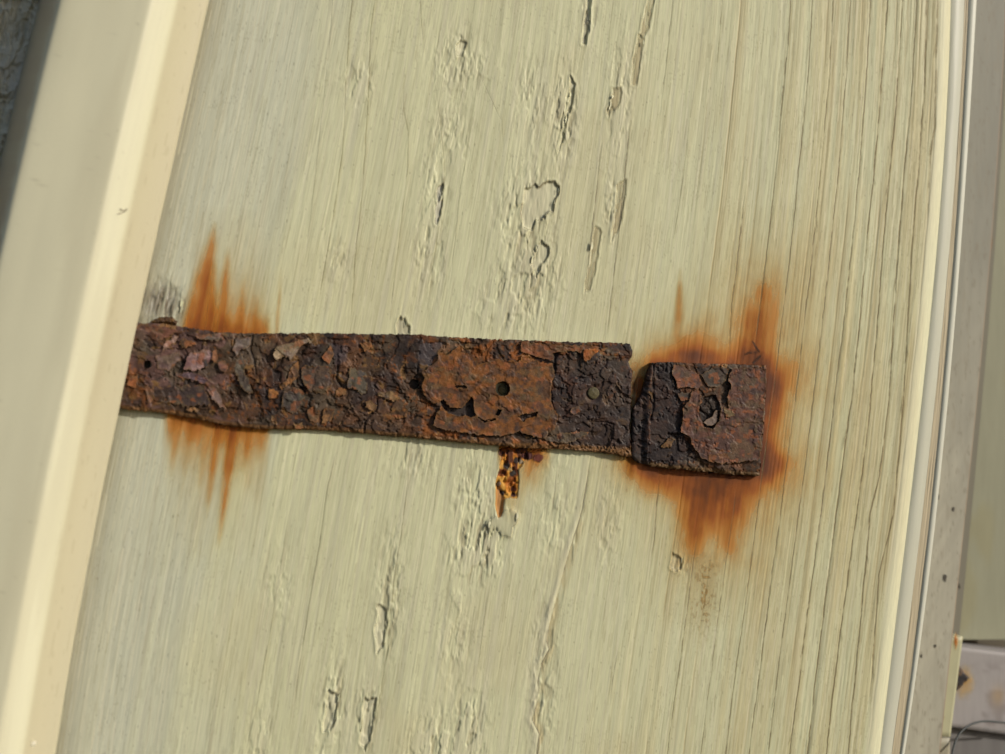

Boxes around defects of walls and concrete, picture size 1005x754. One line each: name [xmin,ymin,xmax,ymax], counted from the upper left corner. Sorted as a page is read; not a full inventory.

peeling [633,0,654,85]
peeling [520,180,560,230]
peeling [531,240,550,278]
corrosion [127,239,269,516]
corrosion [268,338,408,429]
corrosion [421,341,599,477]
corrosion [618,283,799,557]
peeling [322,690,340,732]
peeling [360,698,376,750]